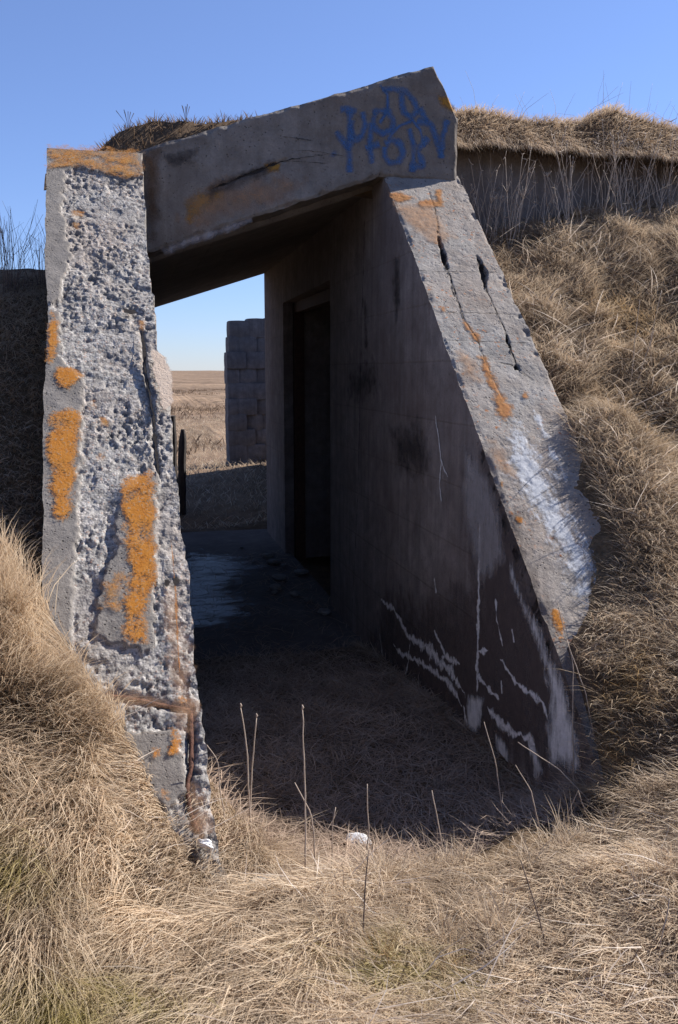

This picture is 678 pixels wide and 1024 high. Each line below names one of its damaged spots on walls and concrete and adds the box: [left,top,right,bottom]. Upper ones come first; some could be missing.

crack [208,137,342,193]
crack [431,199,531,397]
water stain [370,461,583,787]